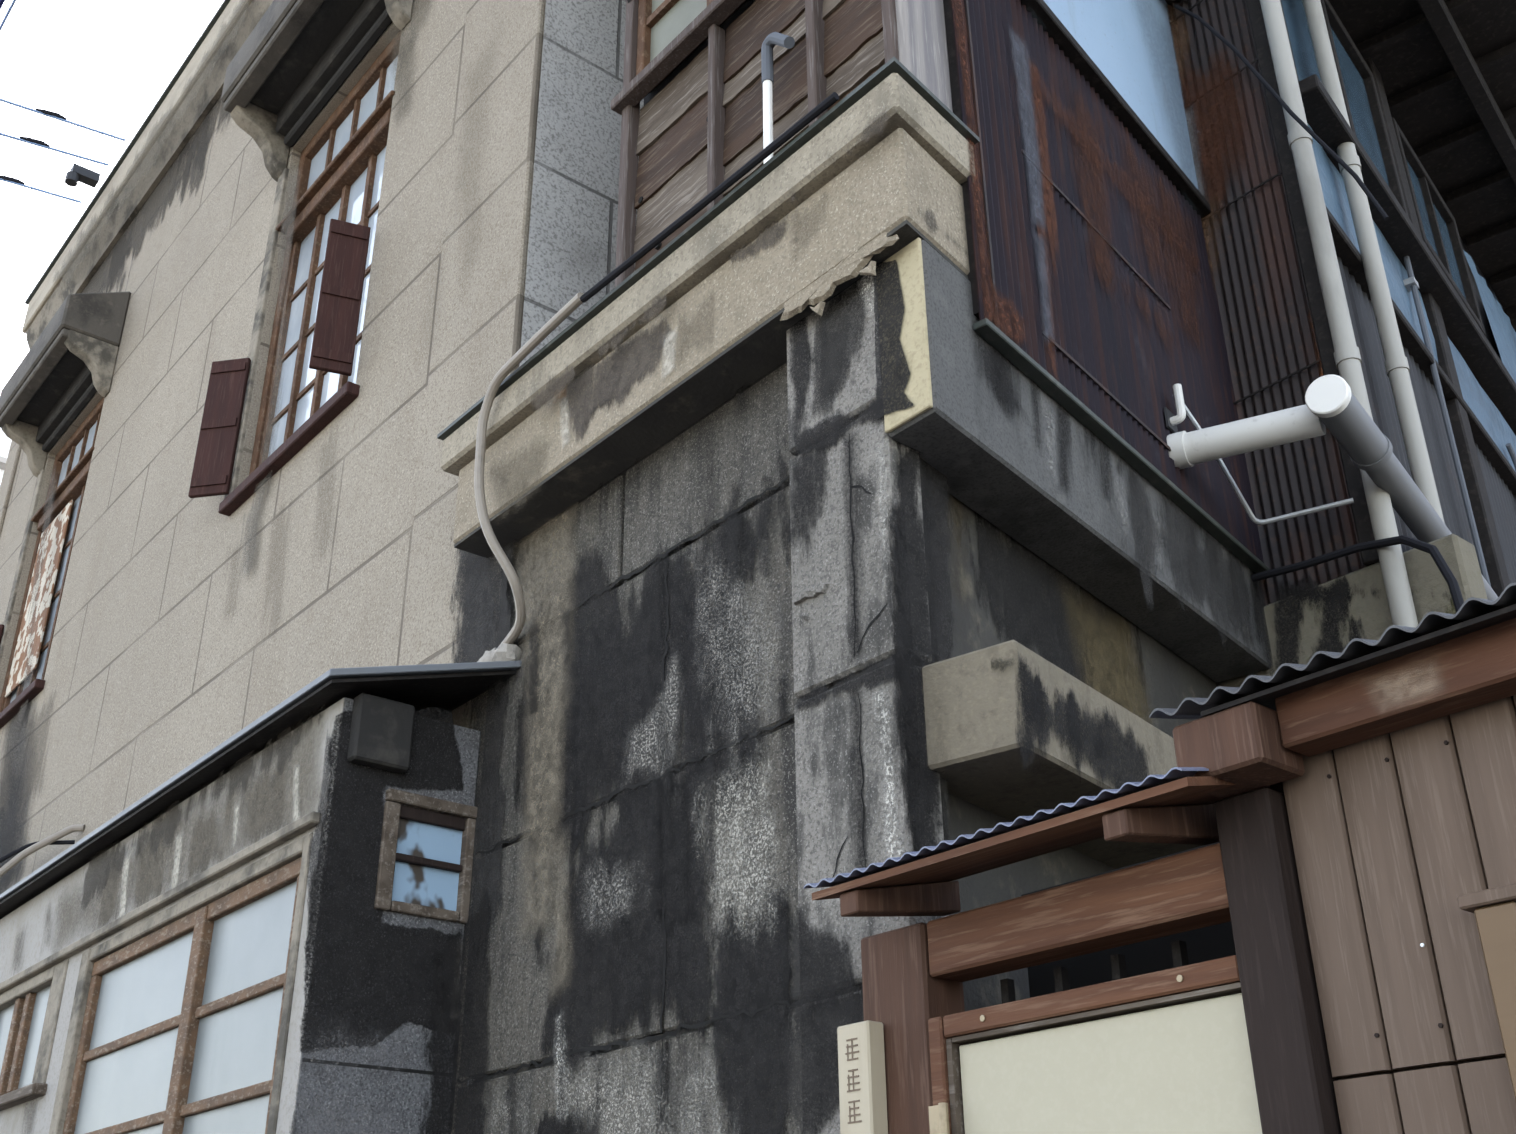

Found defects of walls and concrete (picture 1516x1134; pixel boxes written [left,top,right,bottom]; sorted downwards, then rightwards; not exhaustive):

water stain [82,97,230,293]
spalling [780,232,899,321]
water stain [858,113,888,142]
rust [952,0,1026,342]
rust [1030,66,1057,373]
rust [1166,5,1246,273]
water stain [975,333,1376,671]
water stain [46,260,953,1134]
spalling [878,694,901,857]
water stain [972,511,1149,789]